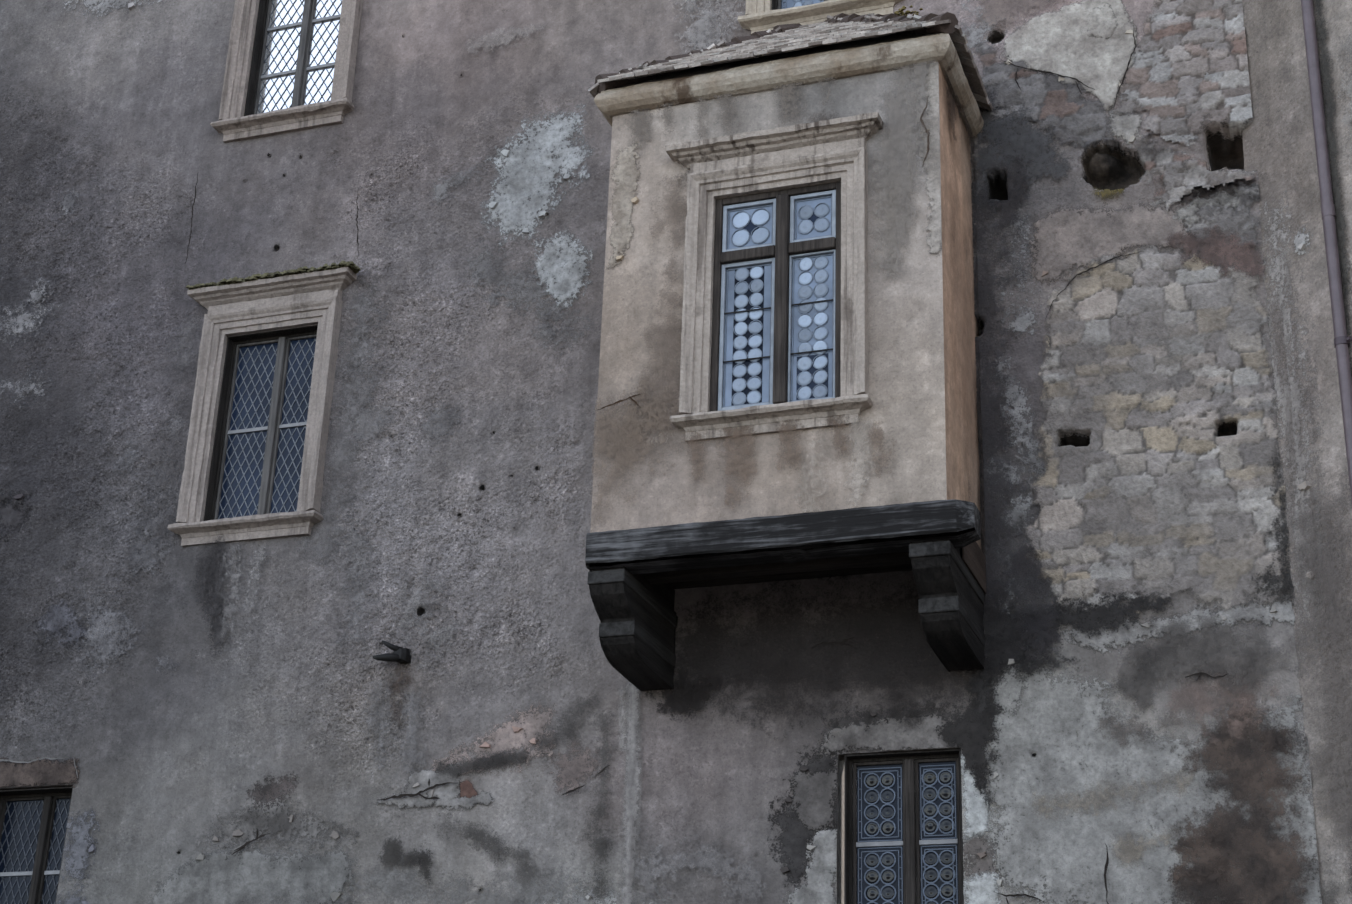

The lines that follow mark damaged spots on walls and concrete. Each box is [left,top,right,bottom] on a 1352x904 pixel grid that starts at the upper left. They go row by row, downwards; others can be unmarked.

water stain [958,0,1006,57]
flaking render [480,105,641,307]
crack [920,96,930,167]
water stain [1315,0,1352,376]
flaking render [976,0,1342,678]
water stain [936,80,1352,904]
water stain [193,534,266,656]
flaking render [376,703,600,812]
flaking render [767,701,959,904]
flaking render [961,657,1322,904]